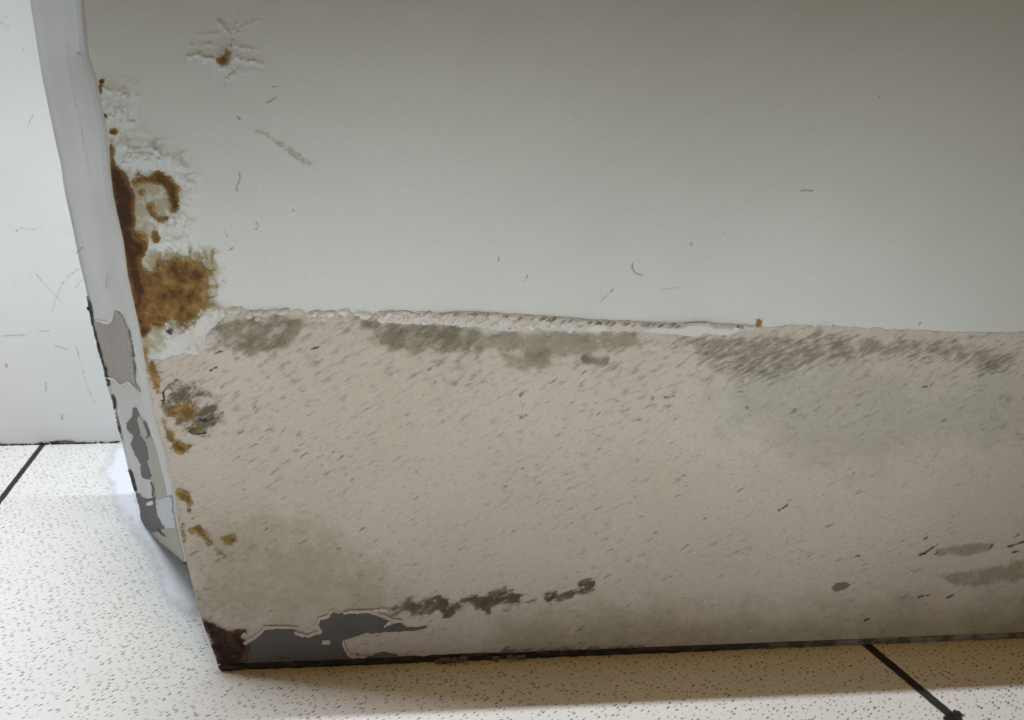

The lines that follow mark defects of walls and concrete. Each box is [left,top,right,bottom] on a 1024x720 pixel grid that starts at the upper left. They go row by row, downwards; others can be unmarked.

corrosion [104,114,217,394]
peeling [225,307,289,321]
peeling [308,309,756,337]
peeling [86,296,184,562]
corrosion [161,400,203,455]
water stain [146,306,1024,658]
corrosion [175,488,236,557]
corrosion [202,619,250,664]
peeling [243,608,427,663]